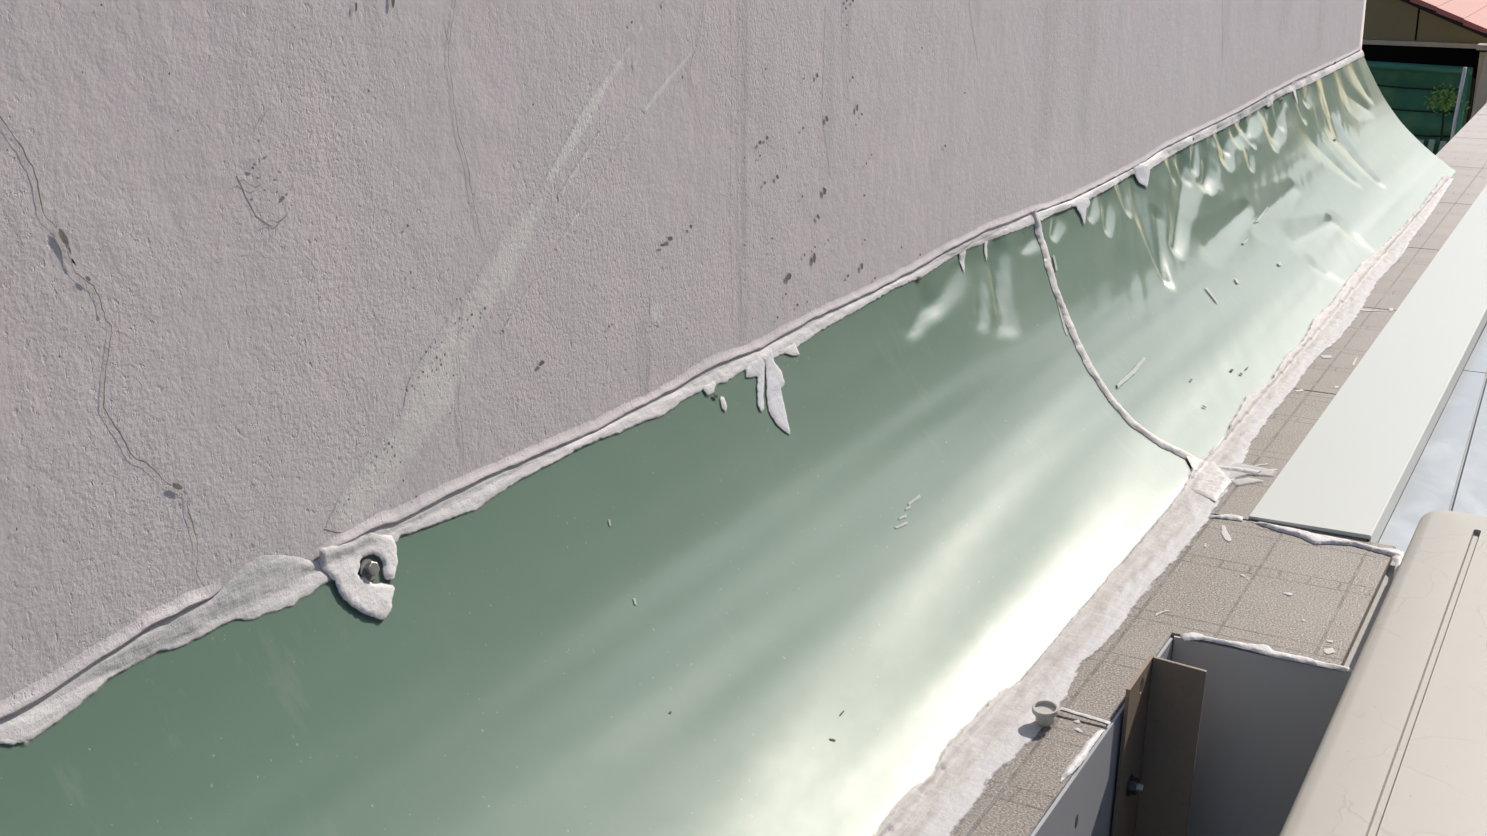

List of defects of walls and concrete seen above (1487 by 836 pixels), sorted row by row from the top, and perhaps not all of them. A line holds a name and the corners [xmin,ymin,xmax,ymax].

crack [0,116,206,589]
crack [443,0,486,256]